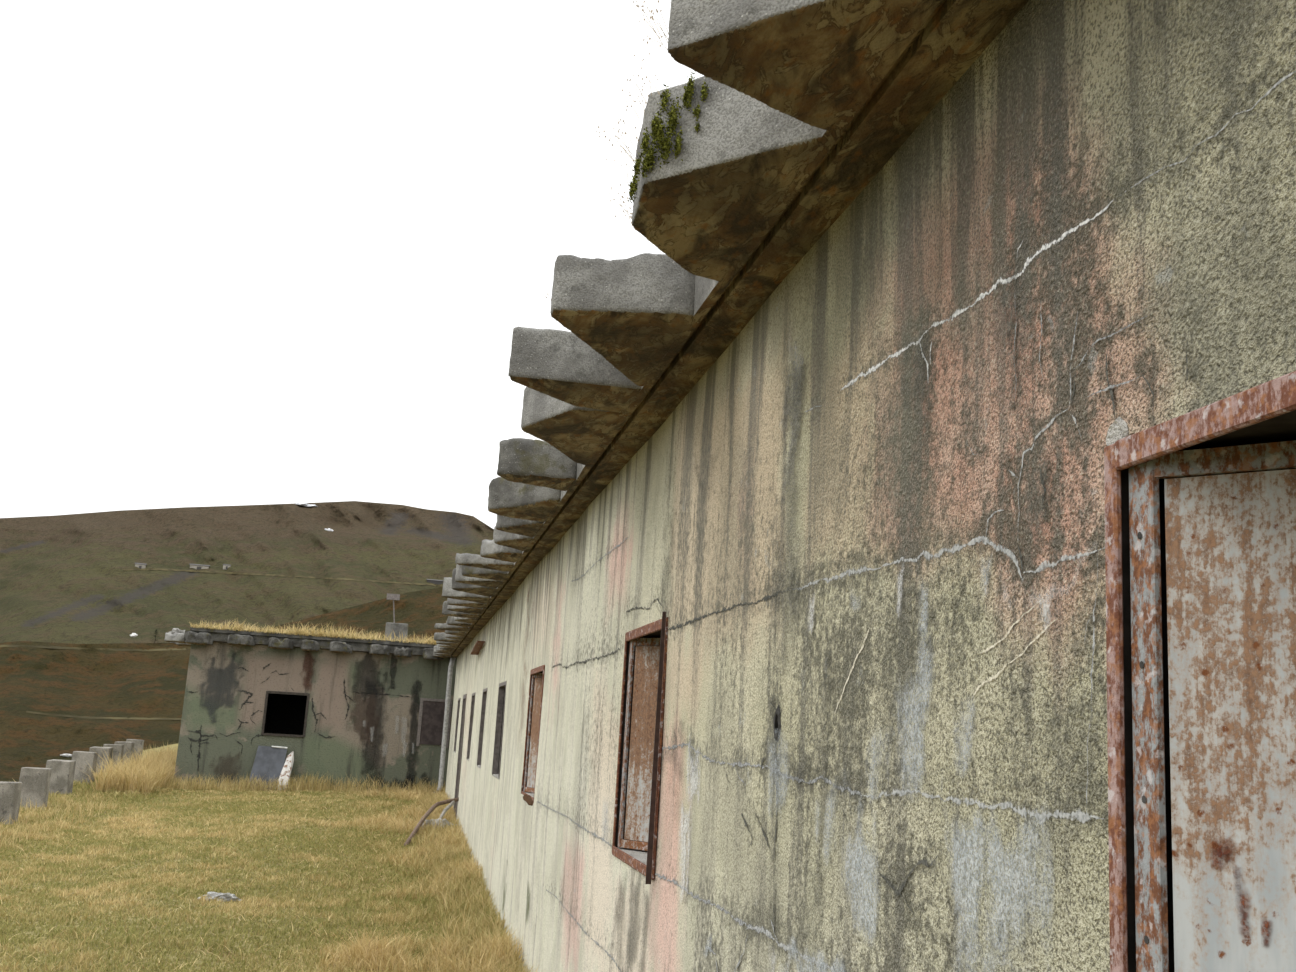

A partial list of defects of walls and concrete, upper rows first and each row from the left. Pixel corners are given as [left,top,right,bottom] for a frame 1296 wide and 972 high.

crack [626,71,1296,972]
crack [572,537,628,582]
water stain [200,653,243,723]
water stain [350,652,429,790]
crack [551,648,620,668]
water stain [904,657,930,782]
rust [1212,840,1232,868]
rust [1239,894,1270,946]